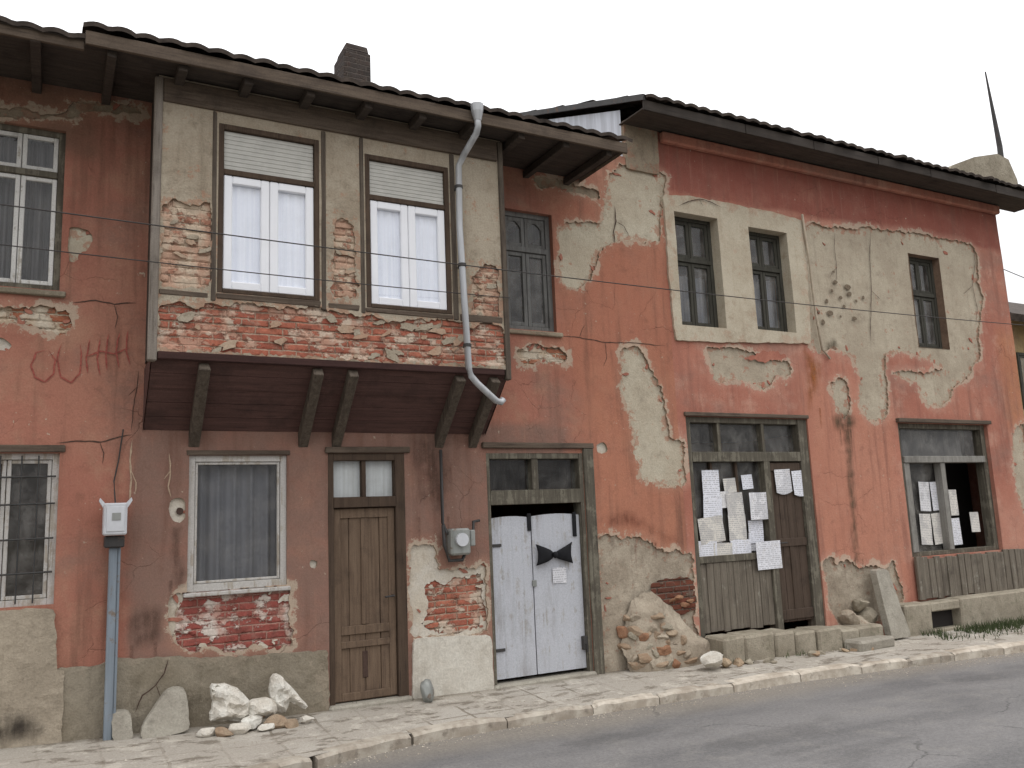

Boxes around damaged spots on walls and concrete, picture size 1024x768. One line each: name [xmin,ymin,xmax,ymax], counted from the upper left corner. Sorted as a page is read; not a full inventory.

spalling [0,305,72,335]
crack [60,379,138,499]
crack [73,300,130,327]
spalling [157,199,505,367]
spalling [534,165,665,289]
crack [563,327,665,364]
spalling [619,346,685,487]
spalling [706,347,790,390]
spalling [805,222,982,420]
spalling [168,586,293,653]
spalling [407,544,487,637]
spalling [598,534,698,672]